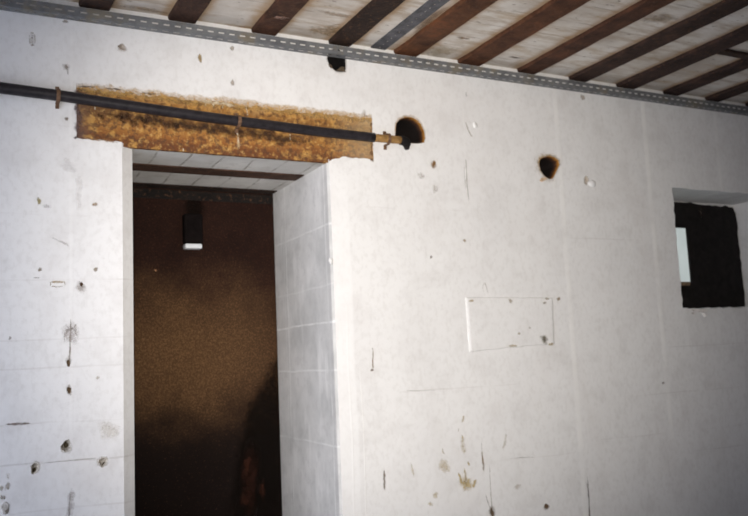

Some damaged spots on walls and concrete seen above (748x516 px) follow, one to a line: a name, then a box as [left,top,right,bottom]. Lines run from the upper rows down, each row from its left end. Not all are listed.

spalling [327,49,346,72]
spalling [395,116,425,144]
spalling [539,155,560,182]